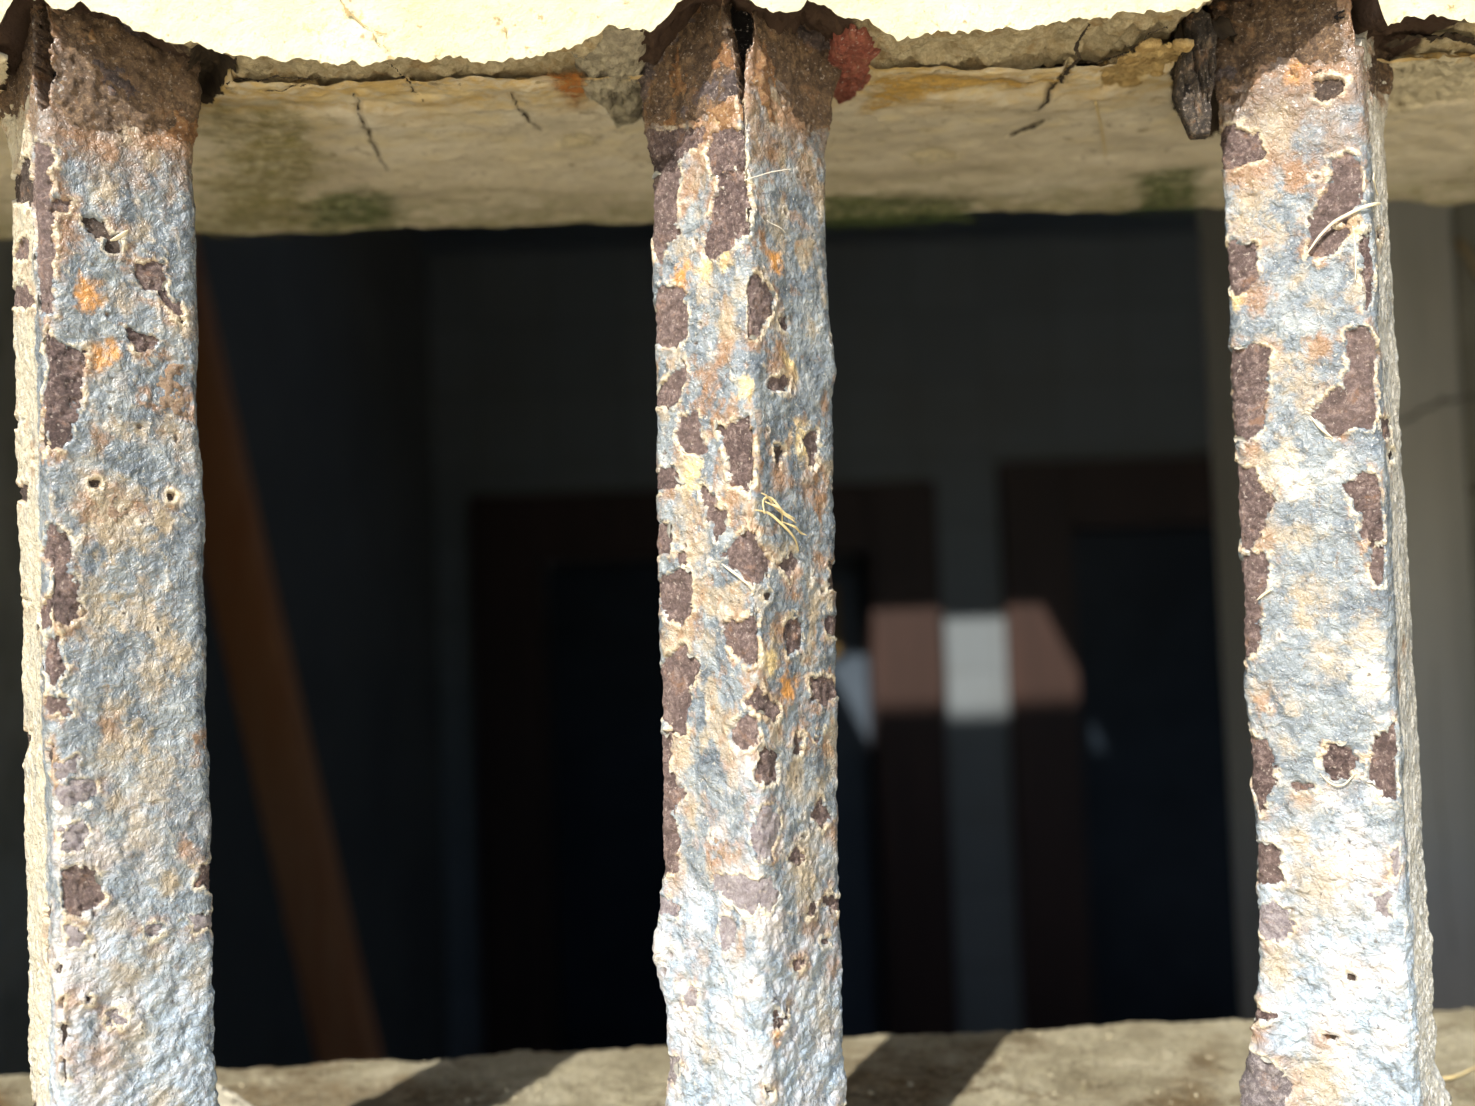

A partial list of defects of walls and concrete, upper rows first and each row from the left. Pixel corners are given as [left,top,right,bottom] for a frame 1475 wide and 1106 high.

spalling [15,157,34,207]
corrosion [0,3,202,146]
spalling [82,218,129,254]
crack [226,74,388,170]
corrosion [637,3,842,271]
crack [1009,23,1168,137]
spalling [1313,79,1345,102]
peeling [1306,172,1381,281]
corrosion [1308,152,1390,439]
corrosion [655,285,798,586]
peeling [89,480,128,523]
corrosion [657,522,701,877]